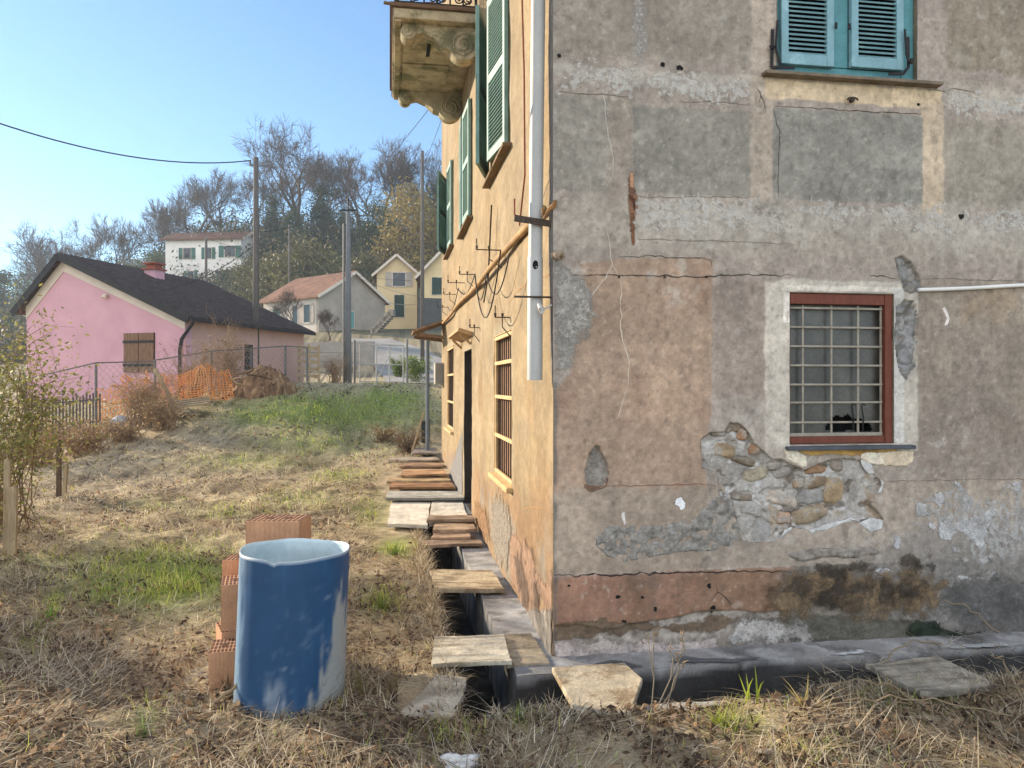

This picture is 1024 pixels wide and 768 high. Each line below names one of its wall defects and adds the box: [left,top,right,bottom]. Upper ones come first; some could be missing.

corrosion [628,173,638,245]
crack [511,232,794,420]
spalling [585,445,609,487]
flaking render [708,423,884,538]
peeling [913,473,1024,580]
water stain [554,553,1024,655]